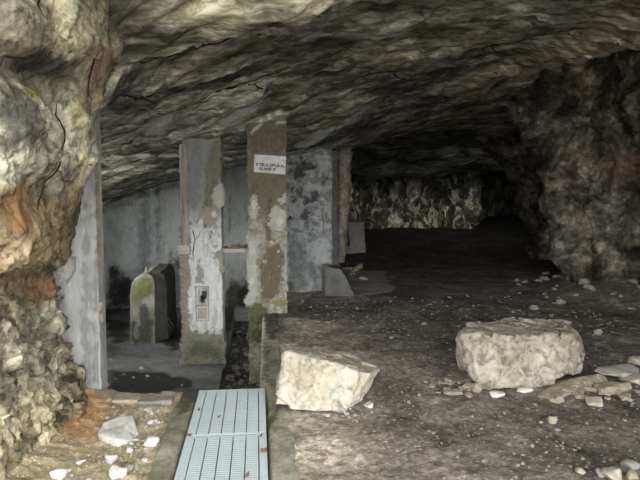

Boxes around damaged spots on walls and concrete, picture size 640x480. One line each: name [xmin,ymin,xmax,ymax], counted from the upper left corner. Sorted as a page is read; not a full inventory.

water stain [288,156,318,222]
spalling [179,183,228,369]
peeling [244,192,293,307]